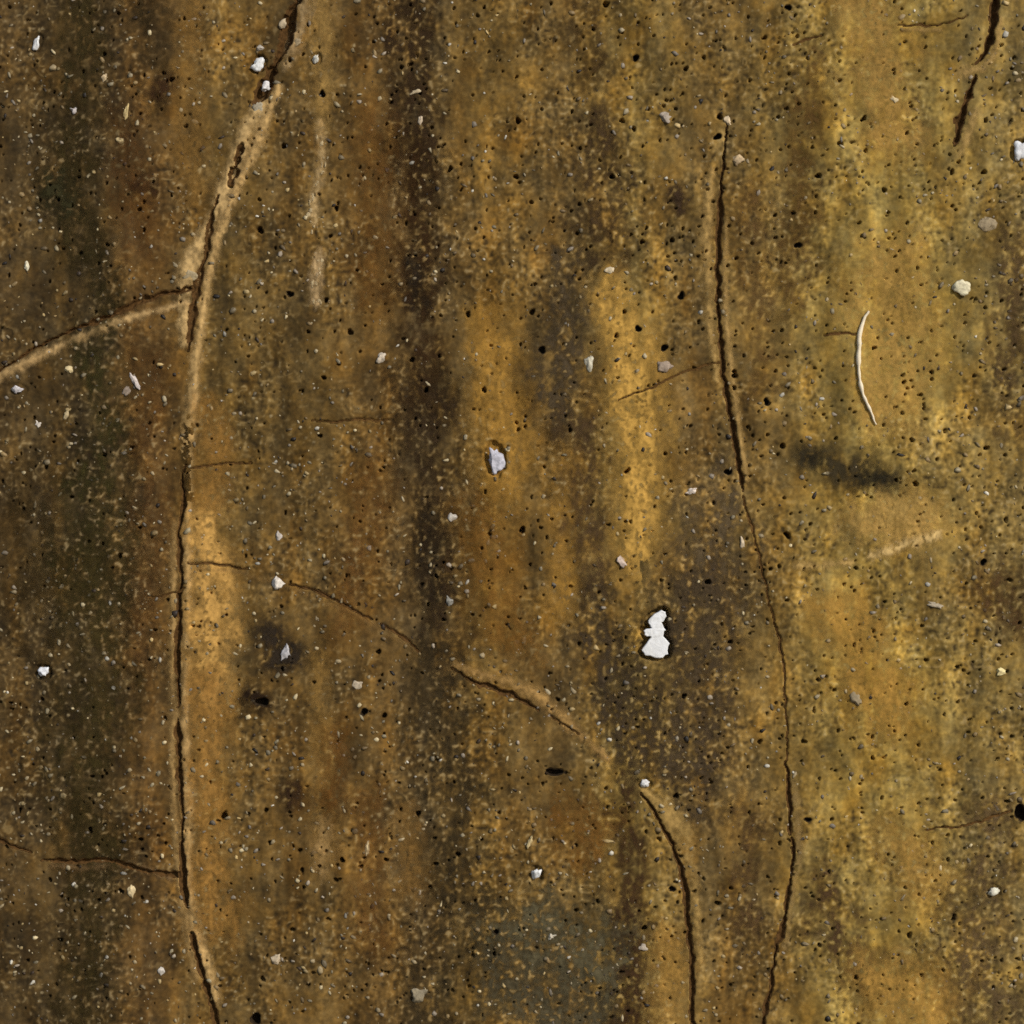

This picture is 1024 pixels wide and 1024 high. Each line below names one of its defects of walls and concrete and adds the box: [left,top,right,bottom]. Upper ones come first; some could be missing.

crack [899,0,1001,155]
water stain [852,241,928,423]
crack [0,0,310,1024]
crack [289,583,421,653]
spalling [489,447,505,475]
crack [451,663,610,761]
peeling [642,610,670,658]
crack [618,123,801,1024]
water stain [811,595,910,733]
water stain [797,442,941,557]
water stain [810,870,1019,1024]